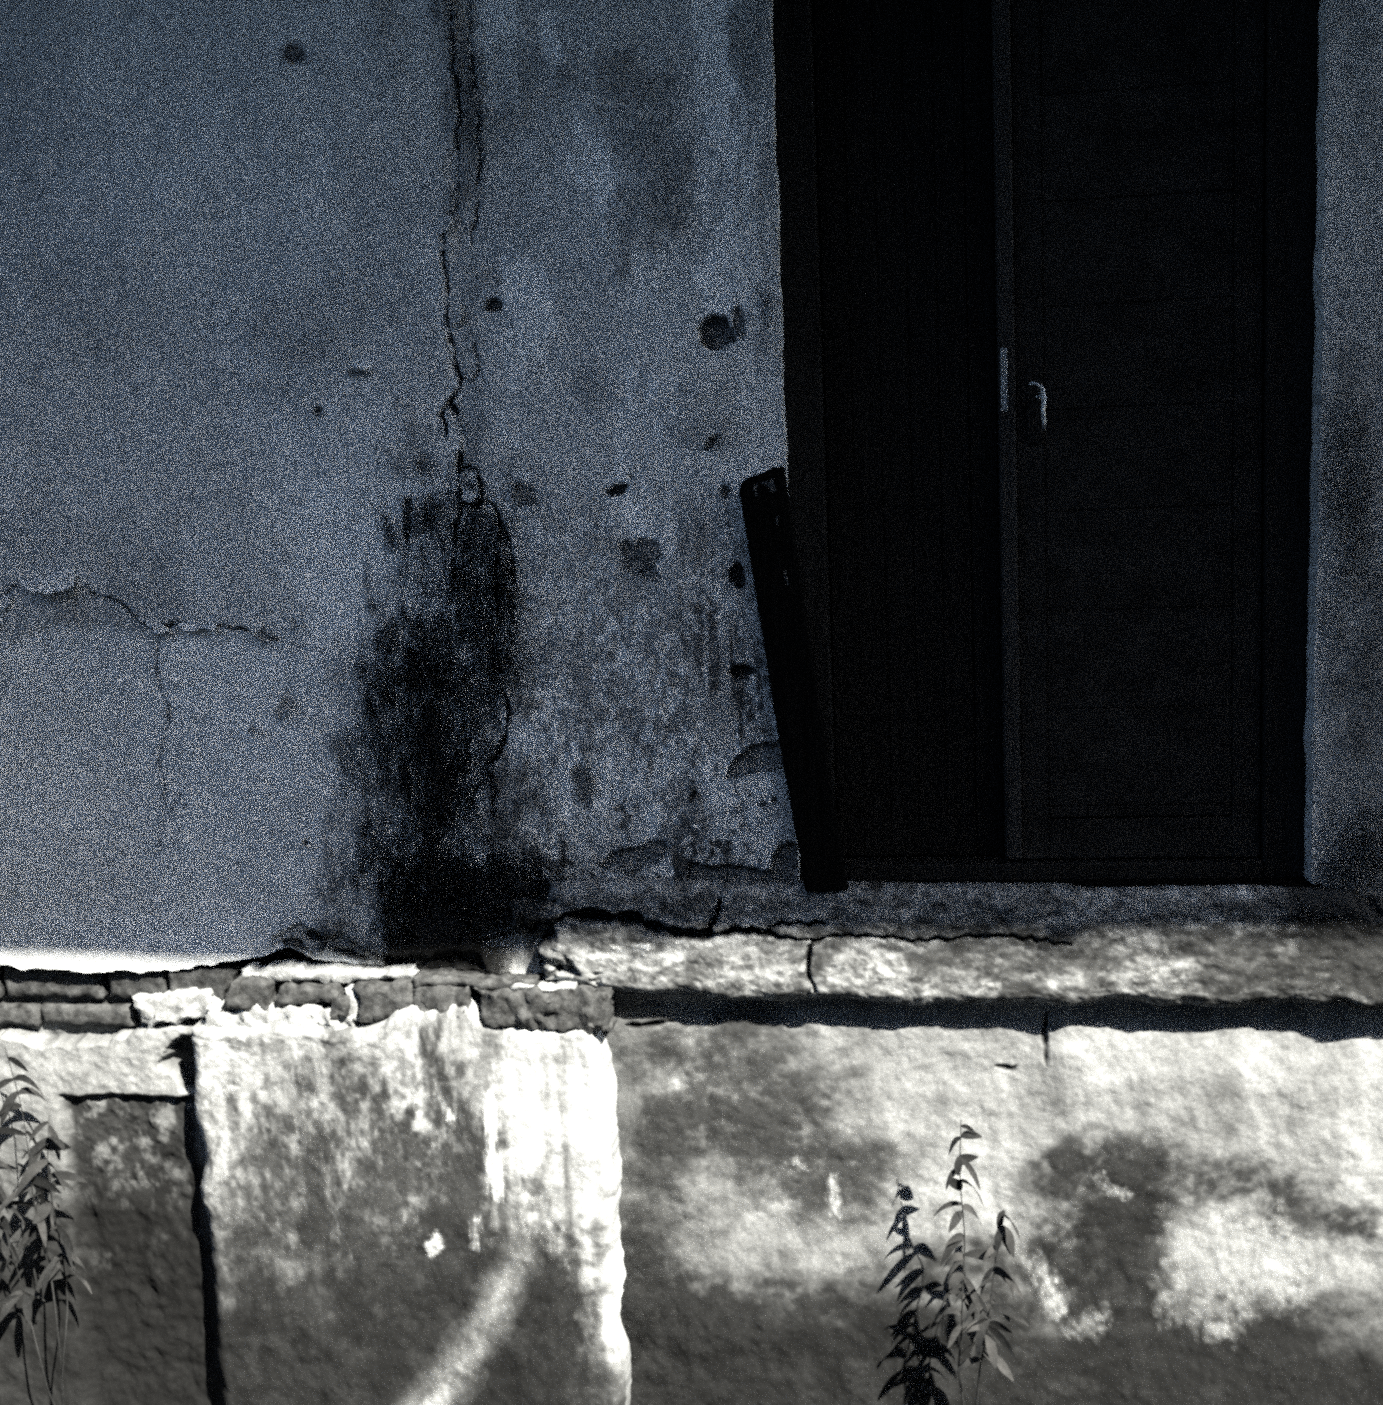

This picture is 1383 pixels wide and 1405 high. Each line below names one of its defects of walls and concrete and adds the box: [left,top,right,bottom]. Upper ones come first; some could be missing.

crack [441,7,514,636]
flaking render [0,569,76,625]
crack [91,593,174,839]
spalling [0,925,617,1034]
leakage [318,494,563,976]
crack [474,697,510,799]
flaking render [570,764,593,807]
flaking render [687,844,798,884]
crack [560,900,1002,986]
leakage [625,1017,882,1216]
leakage [212,1092,595,1405]
leakage [618,1137,1383,1405]